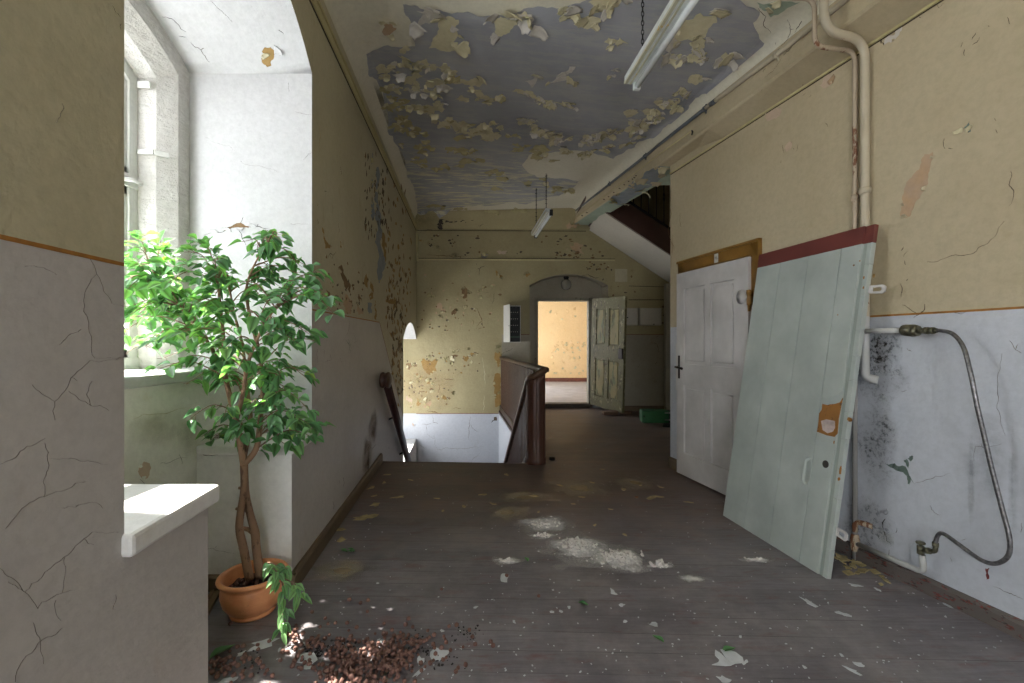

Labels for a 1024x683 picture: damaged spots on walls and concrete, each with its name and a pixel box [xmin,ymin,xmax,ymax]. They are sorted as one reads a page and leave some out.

peeling [261,45,283,67]
peeling [322,0,800,409]
peeling [900,152,935,219]
crack [937,175,1014,262]
crack [33,259,124,418]
crack [6,441,106,528]
crack [0,532,118,682]